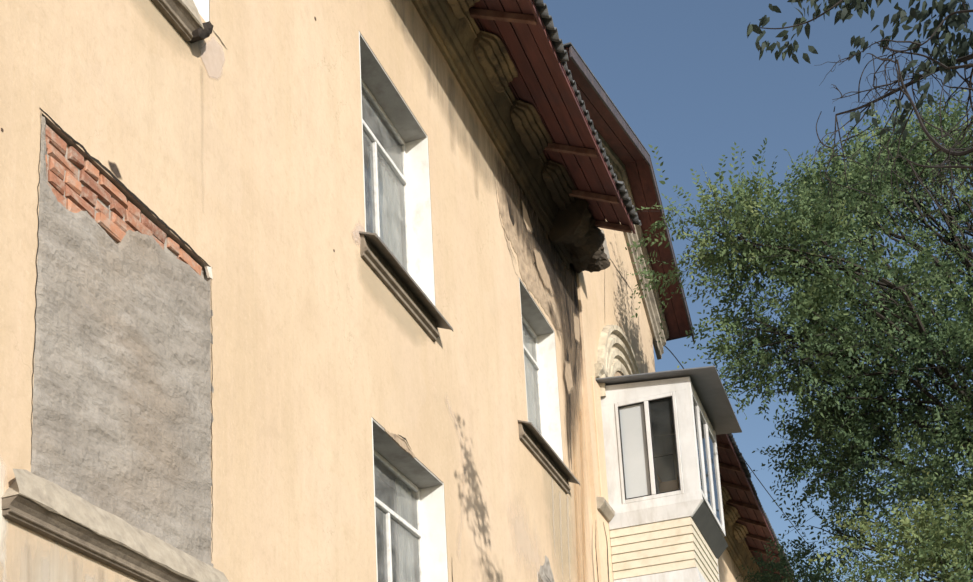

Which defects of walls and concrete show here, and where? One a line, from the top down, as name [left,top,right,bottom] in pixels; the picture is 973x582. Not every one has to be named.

flaking render [45,124,213,279]
damp [434,65,583,466]